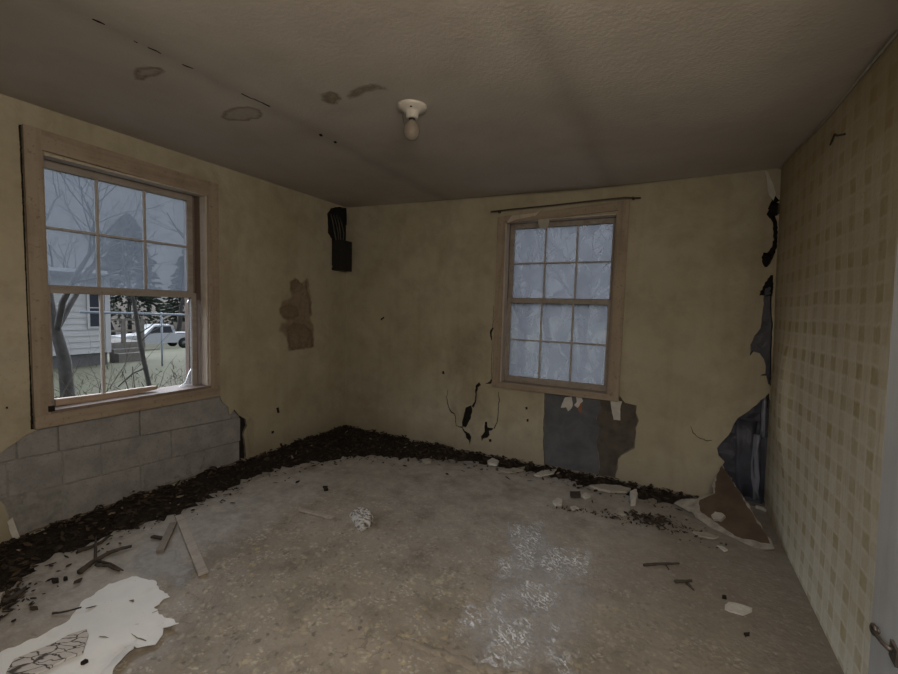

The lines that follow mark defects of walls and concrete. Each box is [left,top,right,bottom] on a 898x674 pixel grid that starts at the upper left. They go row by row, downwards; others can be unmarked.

spalling [0,396,254,539]
crack [446,306,500,434]
spalling [543,393,639,479]
spalling [717,284,773,507]